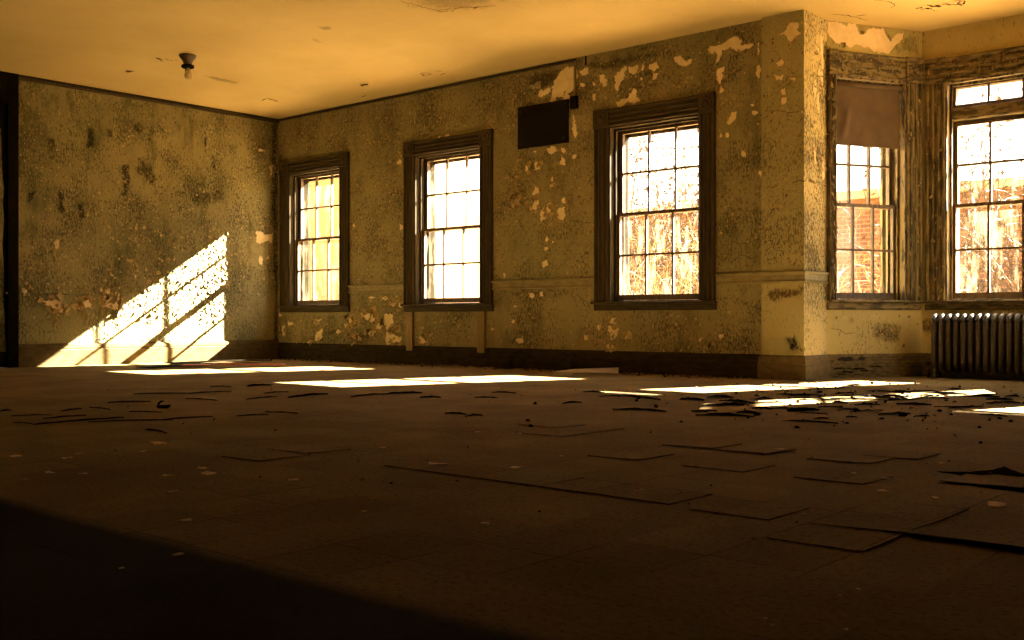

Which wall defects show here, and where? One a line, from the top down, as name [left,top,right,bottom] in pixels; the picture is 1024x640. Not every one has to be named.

peeling [530,62,661,107]
peeling [674,54,692,66]
peeling [707,36,796,105]
peeling [775,22,903,135]
peeling [717,112,737,139]
peeling [507,115,577,268]
peeling [809,147,828,253]
peeling [22,286,139,328]
peeling [278,293,433,346]
peeling [583,313,634,352]
damp [768,288,804,301]